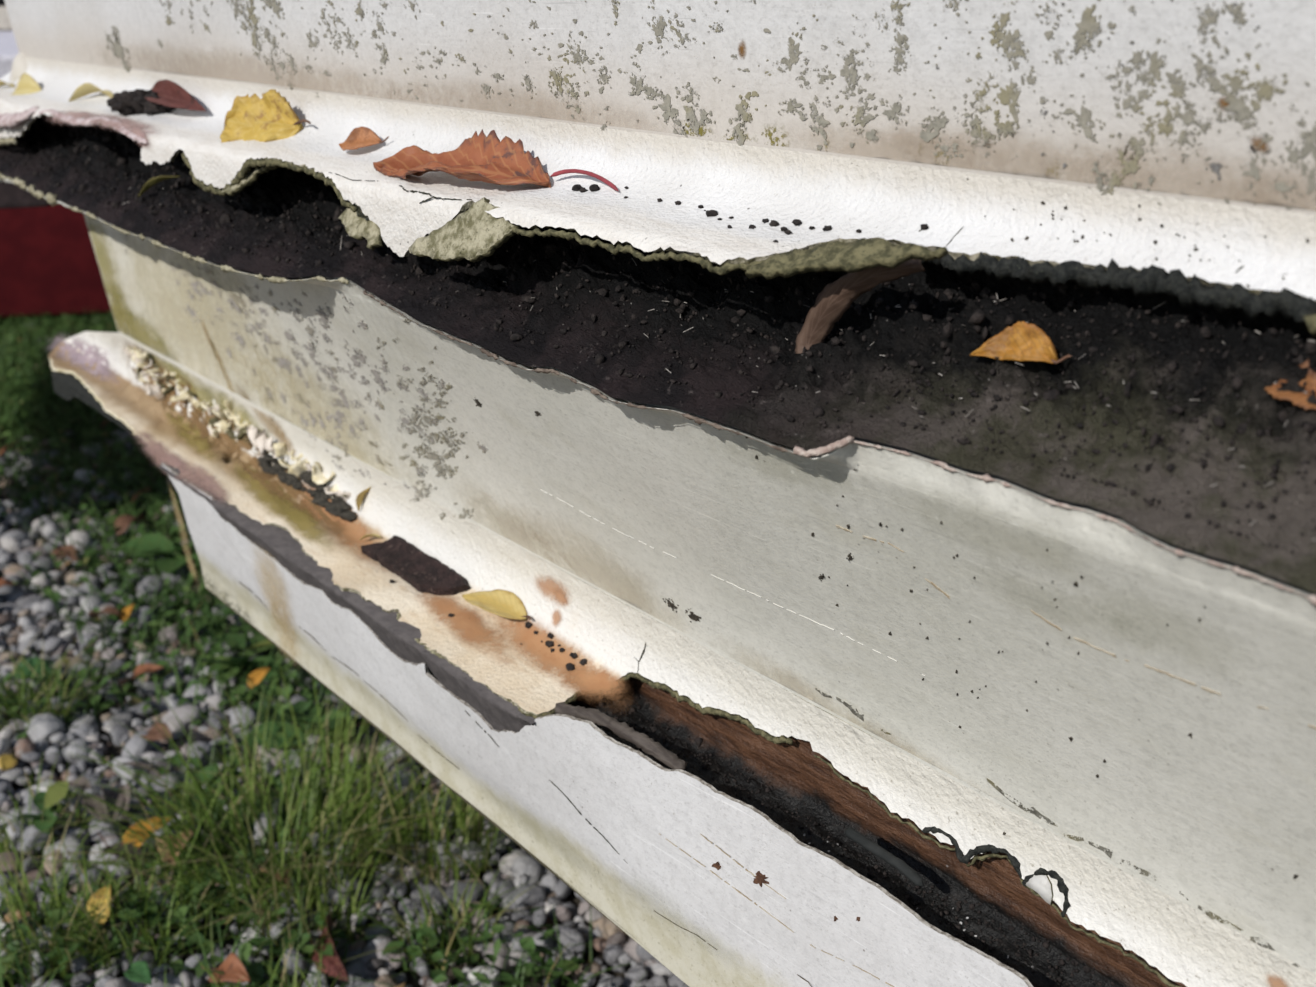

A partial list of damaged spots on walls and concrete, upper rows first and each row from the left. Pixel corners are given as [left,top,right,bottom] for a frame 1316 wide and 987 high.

peeling [0,106,151,146]
peeling [158,0,1316,221]
spalling [182,153,385,251]
damp [111,291,373,557]
peeling [0,172,1316,606]
rust [539,579,567,625]
peeling [663,598,701,622]
spalling [518,691,591,719]
spalling [617,673,793,745]
peeling [753,871,769,887]
spalling [813,755,1182,987]
rust [1268,977,1286,987]